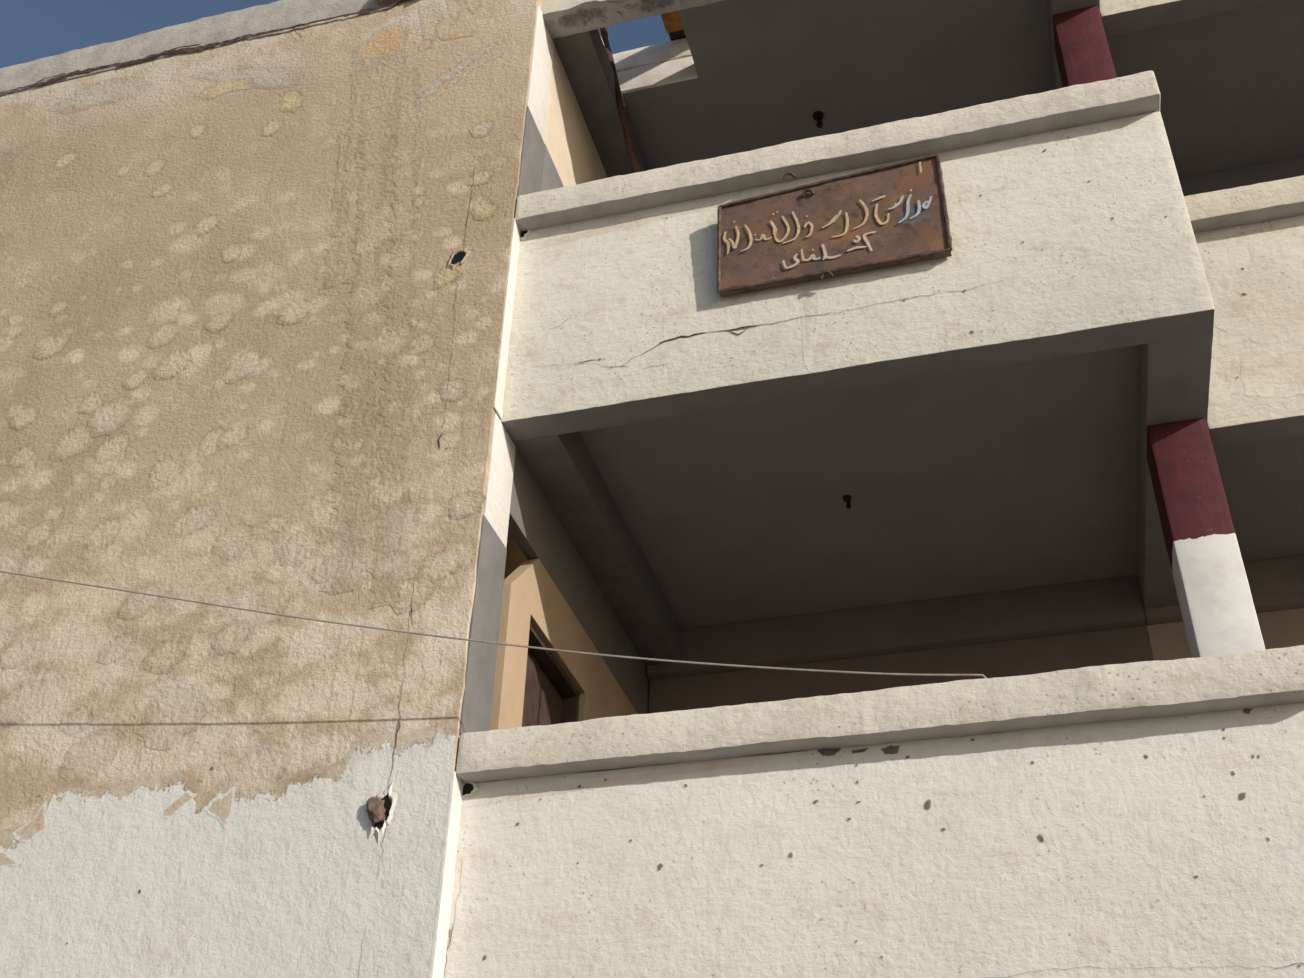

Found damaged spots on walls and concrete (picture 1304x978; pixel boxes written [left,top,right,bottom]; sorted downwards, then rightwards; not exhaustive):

spalling [451,251,465,265]
crack [509,280,1004,371]
crack [388,579,415,782]
peeling [0,795,48,869]
peeling [160,786,235,829]
spalling [373,793,392,830]